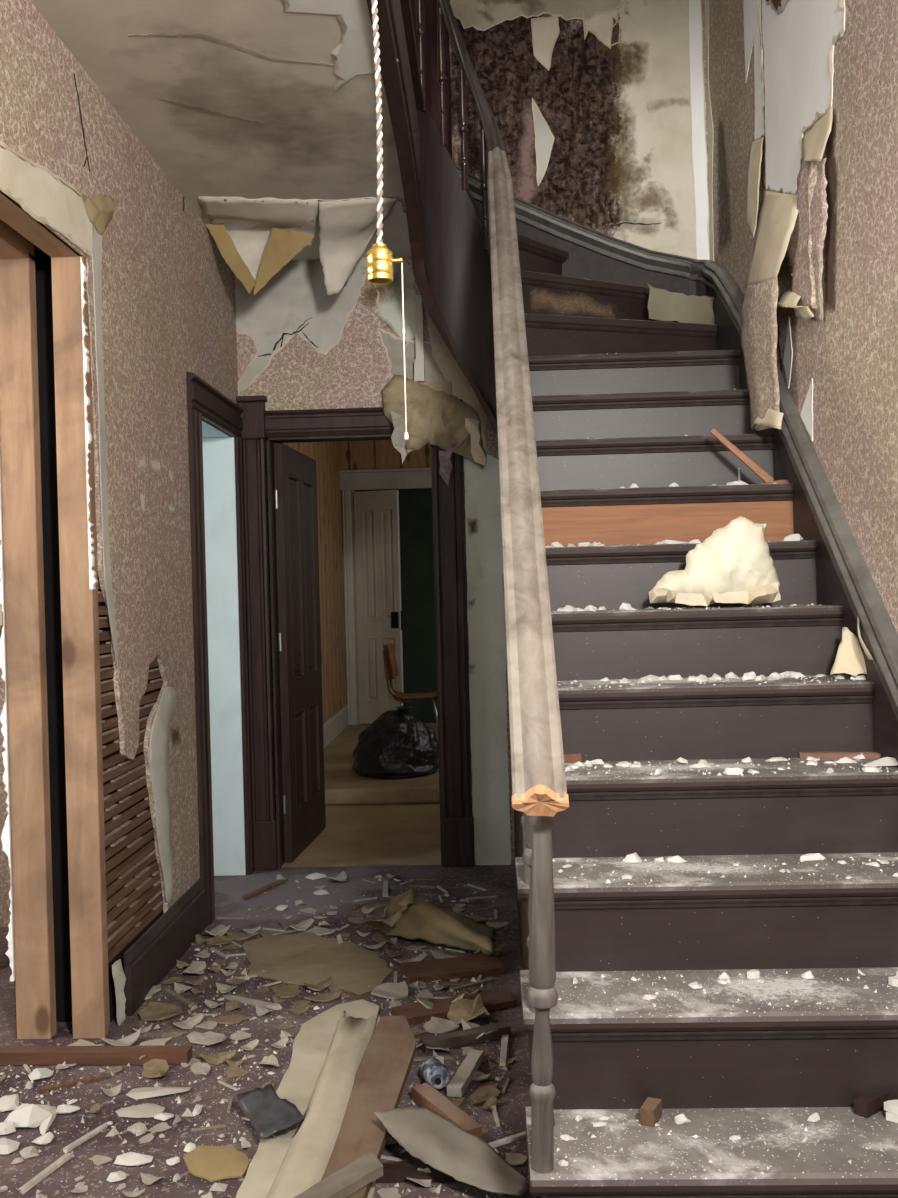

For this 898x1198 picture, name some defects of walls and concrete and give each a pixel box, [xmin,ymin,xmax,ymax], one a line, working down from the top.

crack [74,74,90,172]
damp [451,0,659,235]
peeling [743,0,845,239]
peeling [199,199,260,231]
crack [258,317,319,357]
peeling [777,289,814,388]
peeling [799,378,813,441]
spalling [0,141,177,1026]